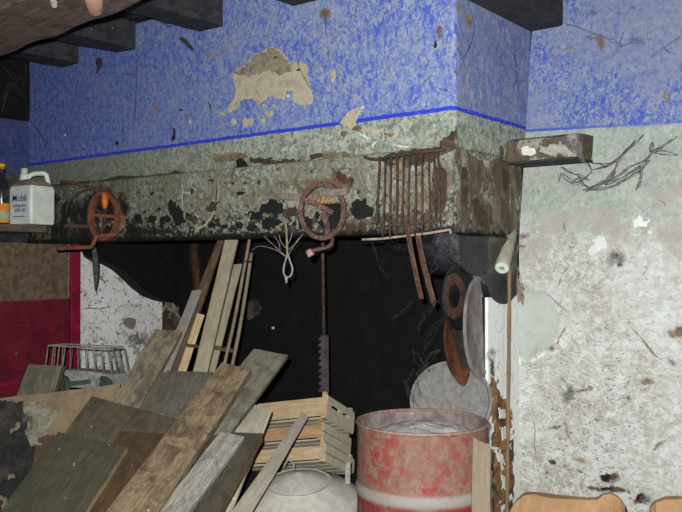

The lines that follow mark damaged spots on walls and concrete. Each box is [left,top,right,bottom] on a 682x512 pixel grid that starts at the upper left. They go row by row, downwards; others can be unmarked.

flaking render [220,46,313,127]
flaking render [340,106,397,149]
peeling [133,200,198,230]
flaking render [489,376,515,512]